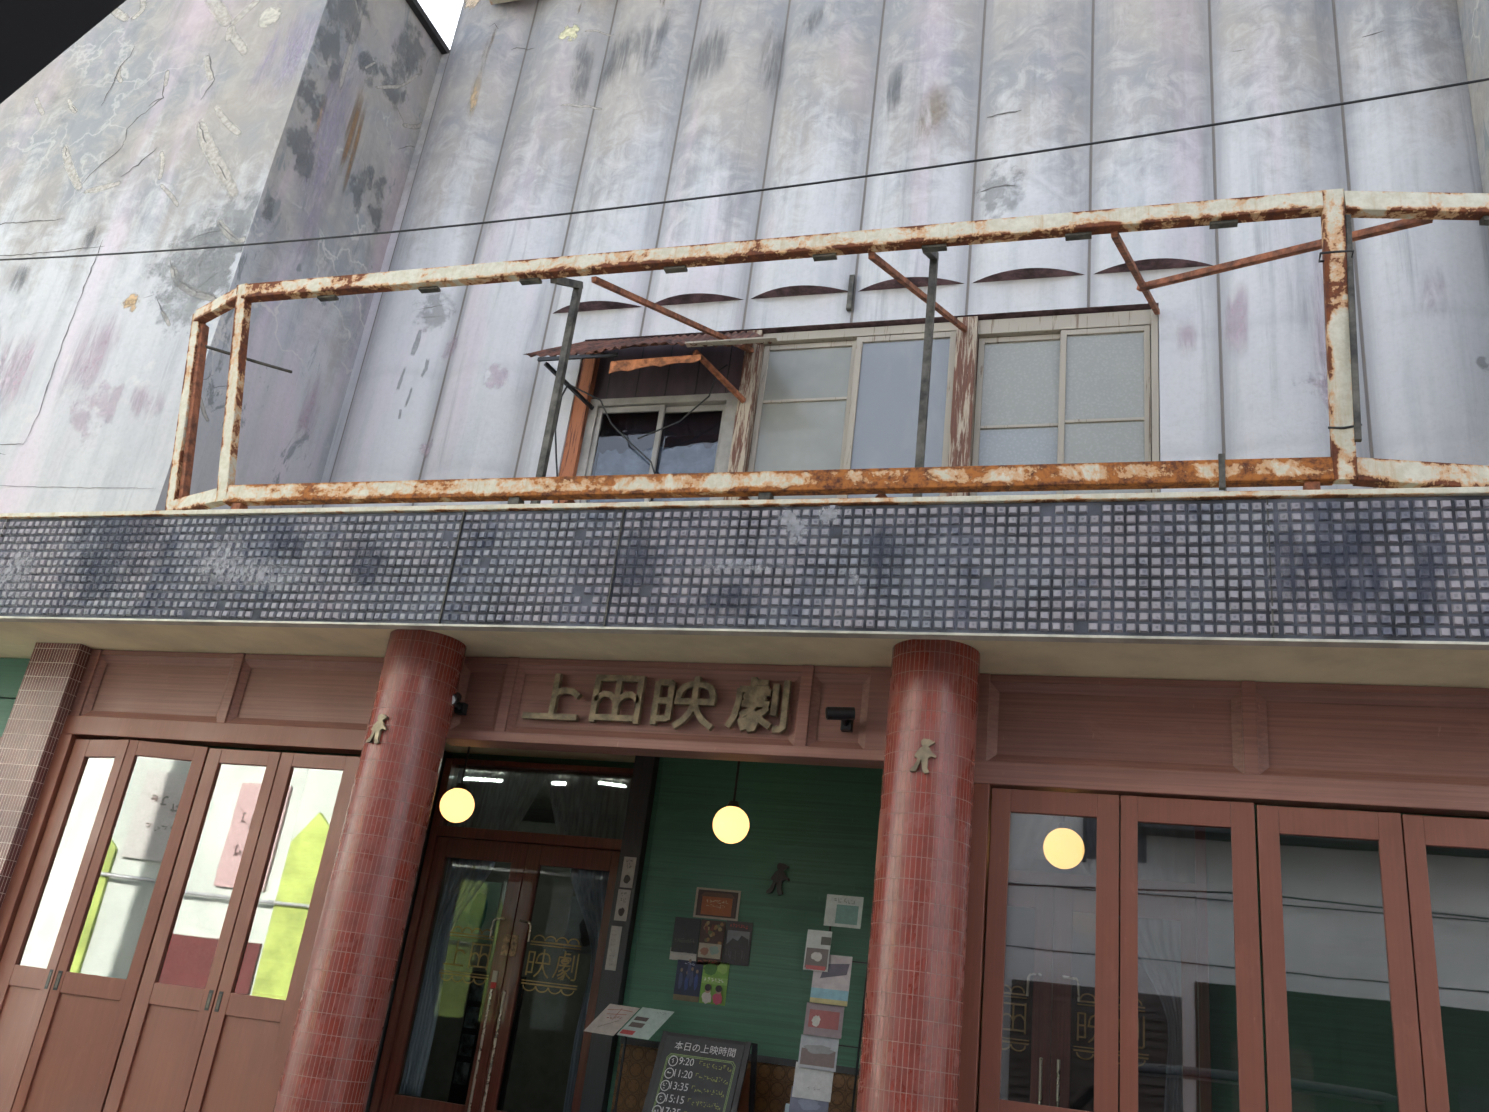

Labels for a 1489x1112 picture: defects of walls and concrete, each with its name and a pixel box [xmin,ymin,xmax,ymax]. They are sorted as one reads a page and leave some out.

crack [34,0,179,206]
crack [145,0,260,326]
peeling [259,7,281,28]
crack [0,219,103,488]